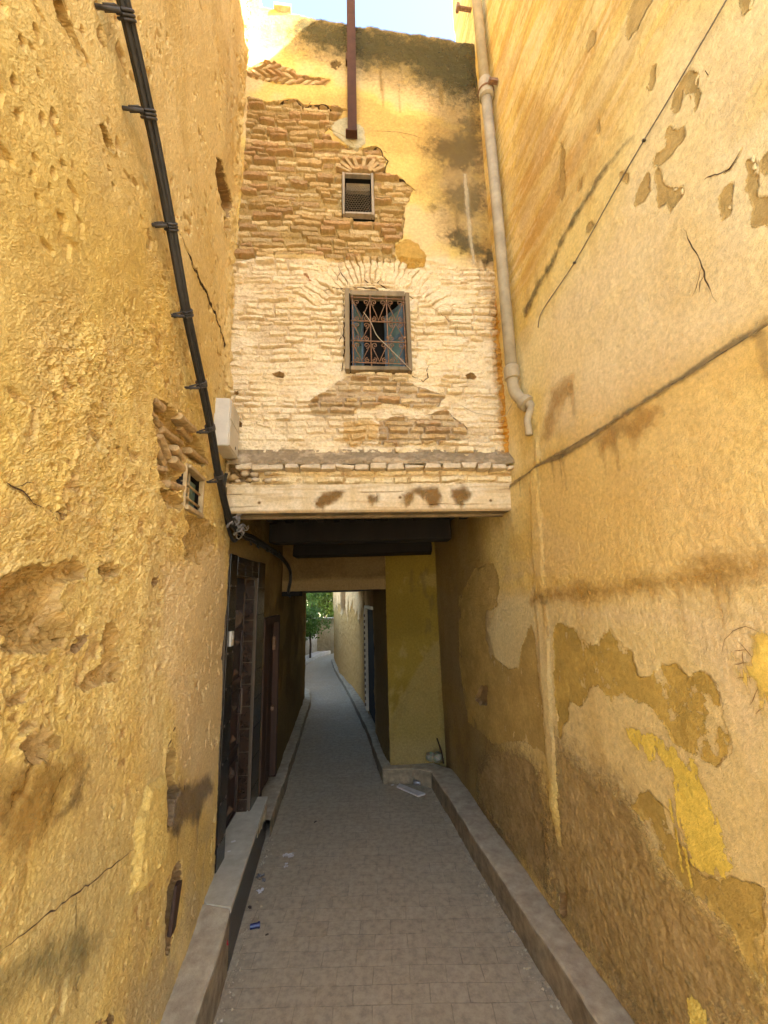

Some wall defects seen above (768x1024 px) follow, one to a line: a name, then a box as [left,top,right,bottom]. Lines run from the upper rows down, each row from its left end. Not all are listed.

flaking render [215,96,413,264]
damp [290,16,493,264]
peeling [619,126,685,212]
crack [705,150,741,179]
peeling [718,151,768,227]
crack [180,234,226,348]
crack [686,232,717,302]
damp [509,324,767,488]
flaking render [152,397,216,565]
damp [167,778,212,834]
flaking render [458,563,767,1024]
crack [6,850,132,947]